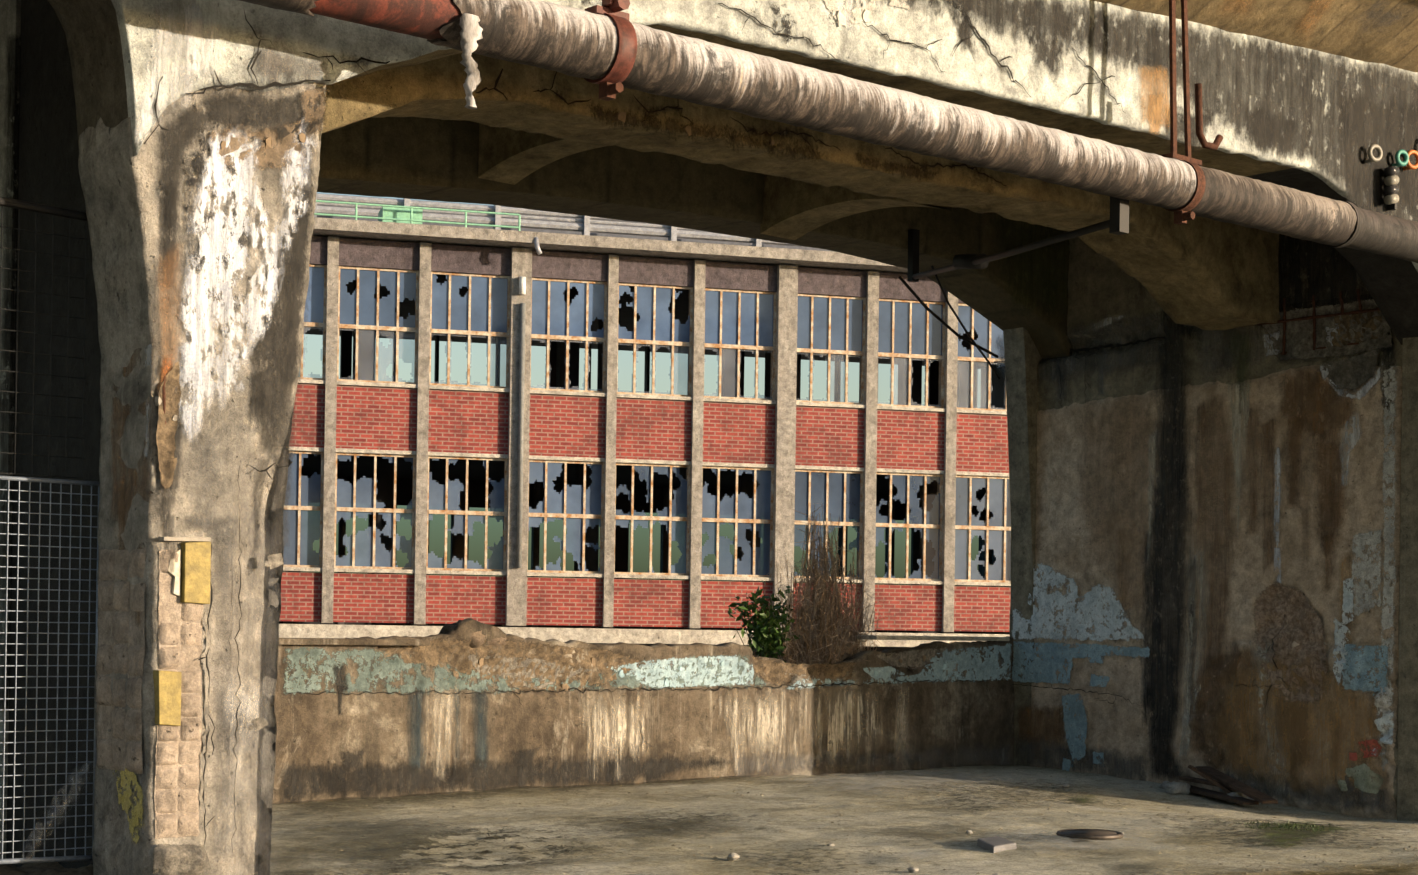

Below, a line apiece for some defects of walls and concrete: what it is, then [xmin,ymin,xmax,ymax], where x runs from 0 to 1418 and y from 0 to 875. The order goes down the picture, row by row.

crack [144,11,390,145]
crack [476,69,591,105]
water stain [771,4,796,42]
crack [1070,48,1124,112]
water stain [907,0,1418,222]
water stain [112,4,321,560]
water stain [1278,234,1373,313]
peeling [283,563,1150,771]
water stain [276,312,1394,872]
spalling [1254,299,1397,794]